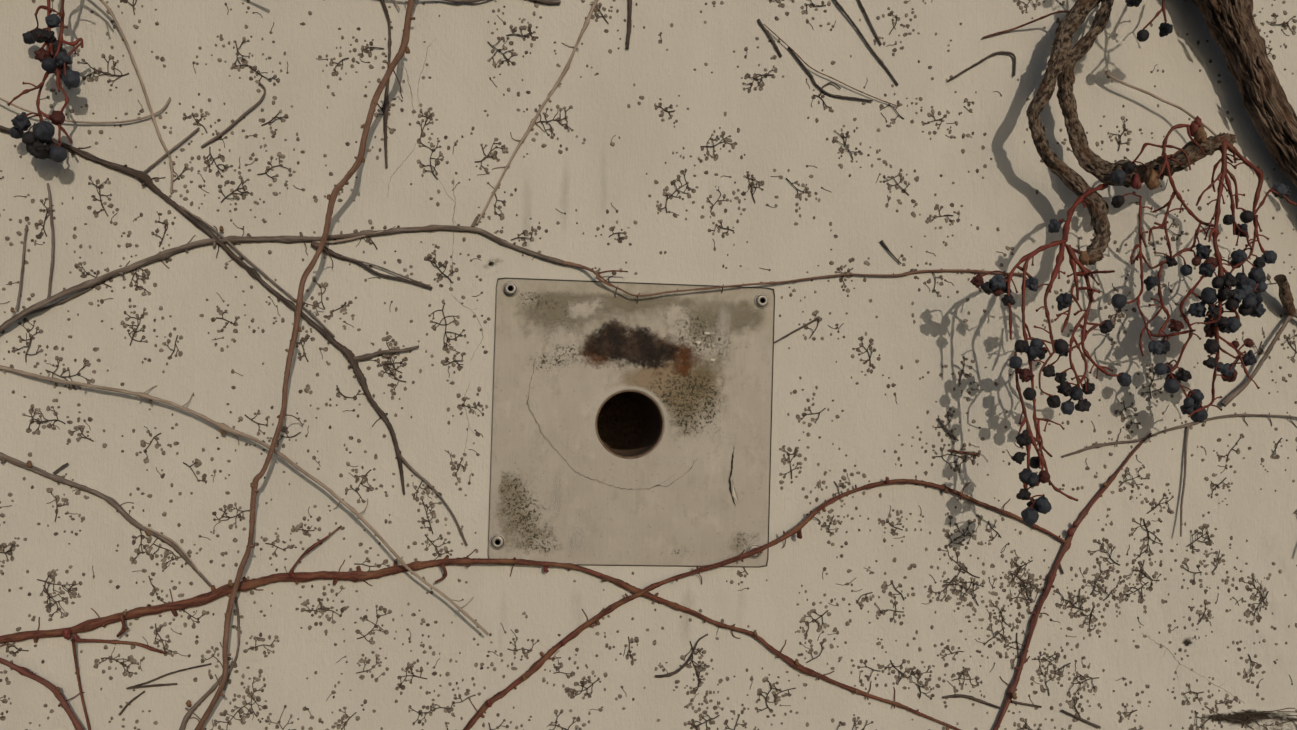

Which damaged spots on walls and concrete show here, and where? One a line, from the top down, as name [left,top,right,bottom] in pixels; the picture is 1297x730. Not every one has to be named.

rust [579,321,713,406]
crack [527,361,697,490]
mould [501,478,550,552]
crack [729,451,738,506]